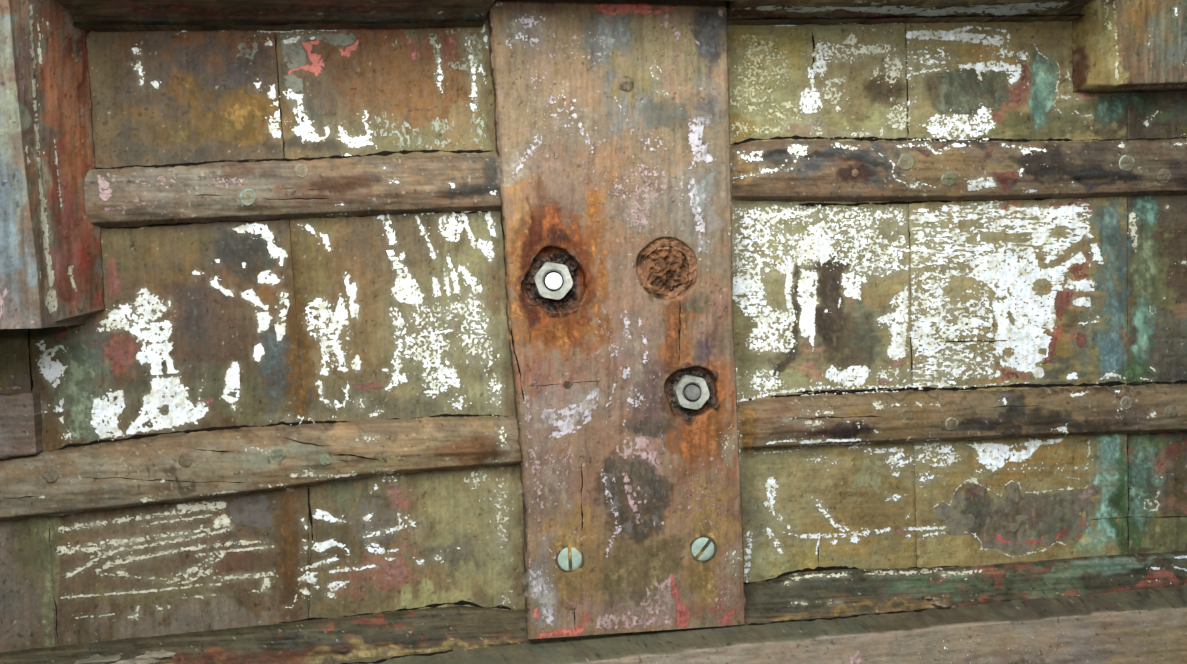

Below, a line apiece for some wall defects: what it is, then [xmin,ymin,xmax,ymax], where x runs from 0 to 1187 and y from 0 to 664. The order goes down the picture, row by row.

peeling [131,44,162,89]
peeling [237,2,503,156]
peeling [505,11,718,272]
peeling [36,288,240,443]
peeling [192,222,290,362]
rust [506,196,608,348]
crack [675,302,683,365]
rust [663,301,757,460]
peeling [684,0,1106,625]
peeling [1127,212,1139,252]
peeling [55,464,460,620]
peeling [523,305,691,639]